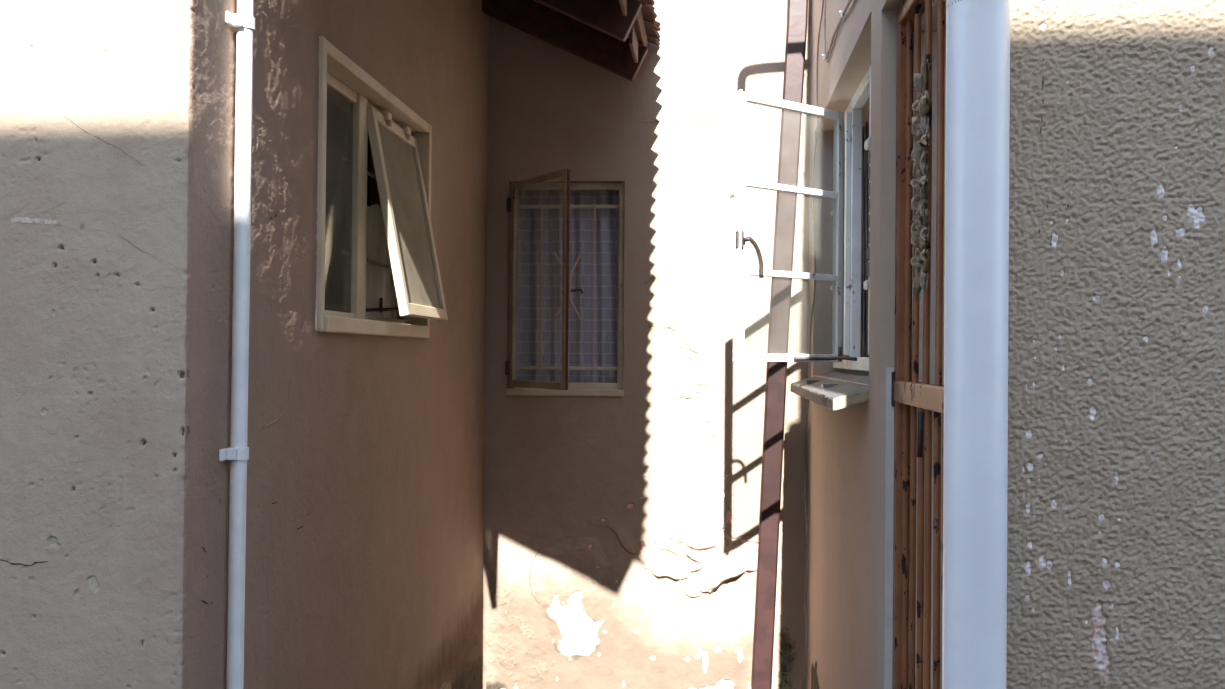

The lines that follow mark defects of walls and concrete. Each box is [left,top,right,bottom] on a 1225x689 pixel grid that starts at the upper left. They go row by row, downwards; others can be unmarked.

crack [0,558,49,566]
peeling [682,474,737,594]
peeling [740,537,758,576]
peeling [548,591,606,659]
peeling [676,629,751,689]